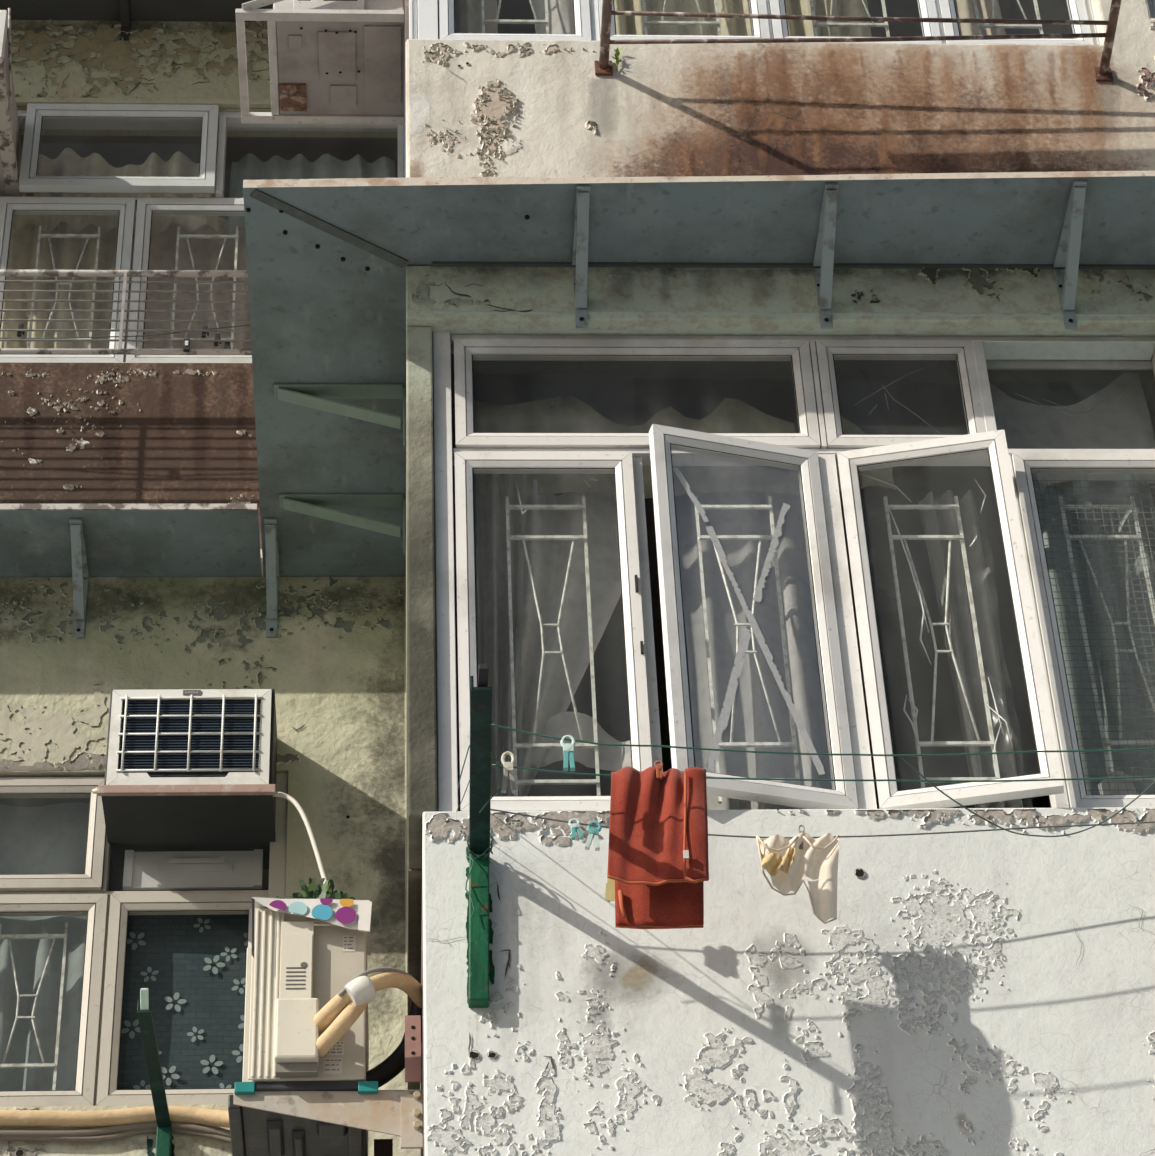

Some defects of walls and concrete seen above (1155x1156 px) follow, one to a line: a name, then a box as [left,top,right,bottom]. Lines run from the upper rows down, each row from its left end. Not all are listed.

peeling [7,19,270,98]
peeling [424,79,521,177]
rust [628,47,1103,177]
flaking render [1136,56,1155,101]
rust [0,362,262,549]
peeling [0,574,405,689]
water stain [369,675,405,814]
flaking render [854,808,1155,835]
water stain [370,828,405,971]
peeling [426,964,661,1156]
peeling [677,869,1073,1156]
peeling [0,1141,47,1156]